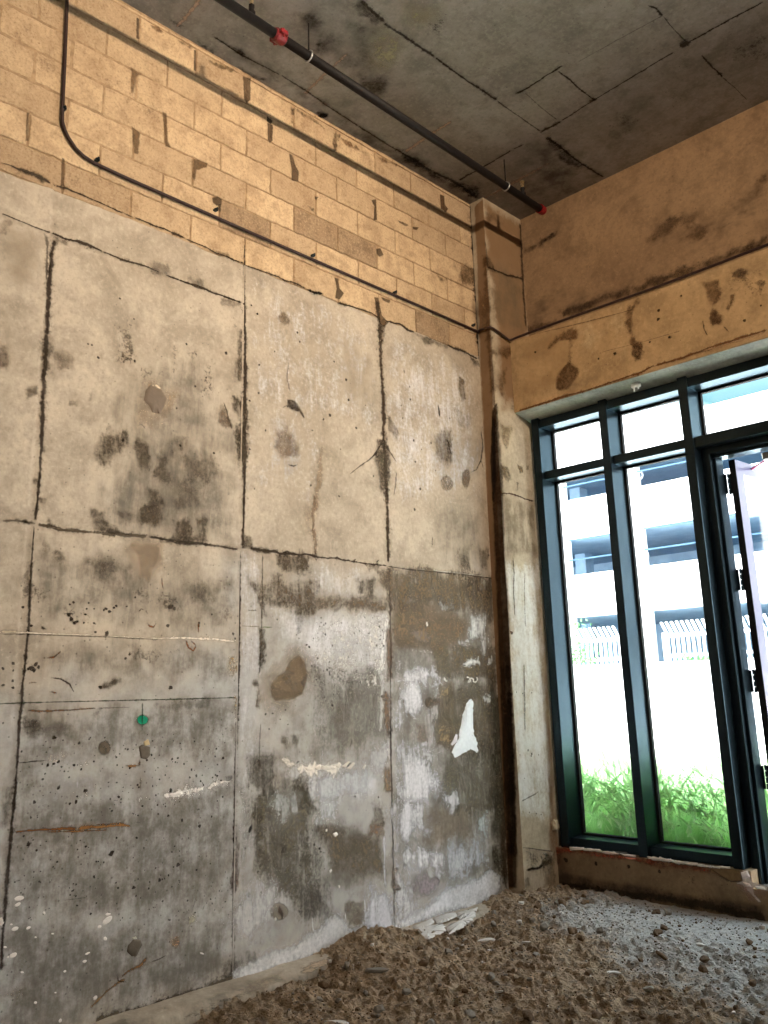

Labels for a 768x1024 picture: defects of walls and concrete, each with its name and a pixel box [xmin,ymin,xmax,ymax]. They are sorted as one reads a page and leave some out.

leakage [563,237,767,360]
leakage [549,329,577,348]
leakage [556,363,578,390]
leakage [91,509,119,534]
leakage [96,396,553,1022]
peeling [451,699,478,758]
spalling [282,741,390,778]
corrosion [16,823,130,832]